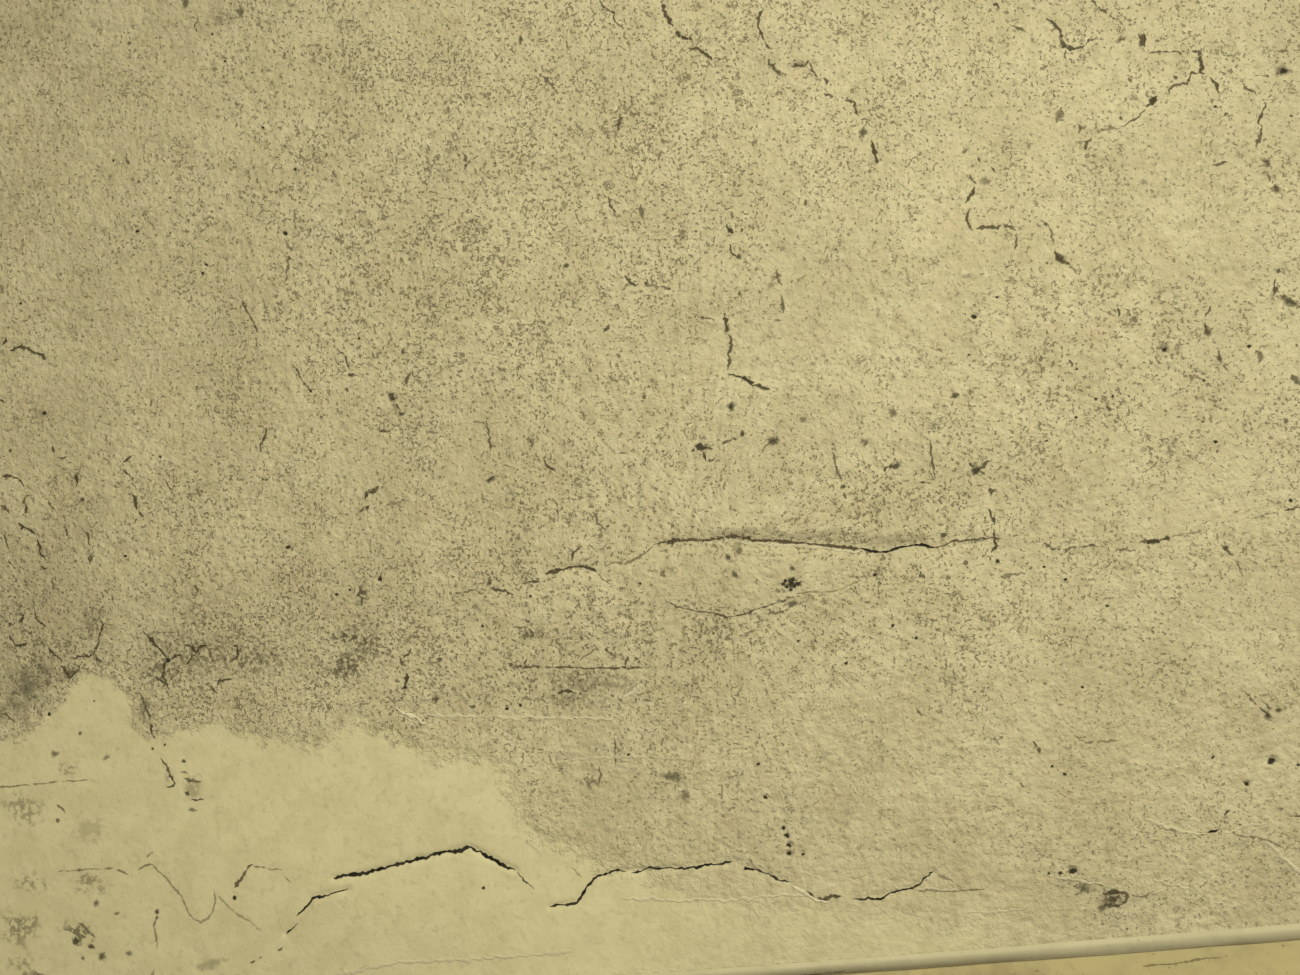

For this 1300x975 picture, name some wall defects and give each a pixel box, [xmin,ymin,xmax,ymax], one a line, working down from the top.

crack [456,487,1001,618]
water stain [69,928,105,960]
crack [233,864,253,900]
crack [251,845,985,963]